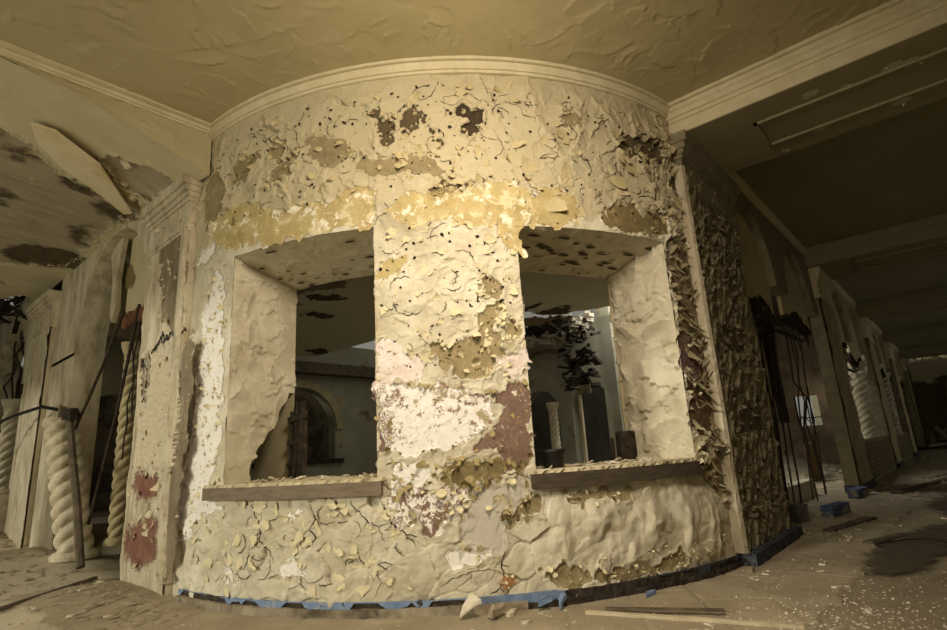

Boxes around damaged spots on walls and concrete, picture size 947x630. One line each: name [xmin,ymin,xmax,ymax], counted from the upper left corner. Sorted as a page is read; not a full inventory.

flaking render [121,79,827,610]
rust [123,469,161,572]
damp [862,495,947,574]